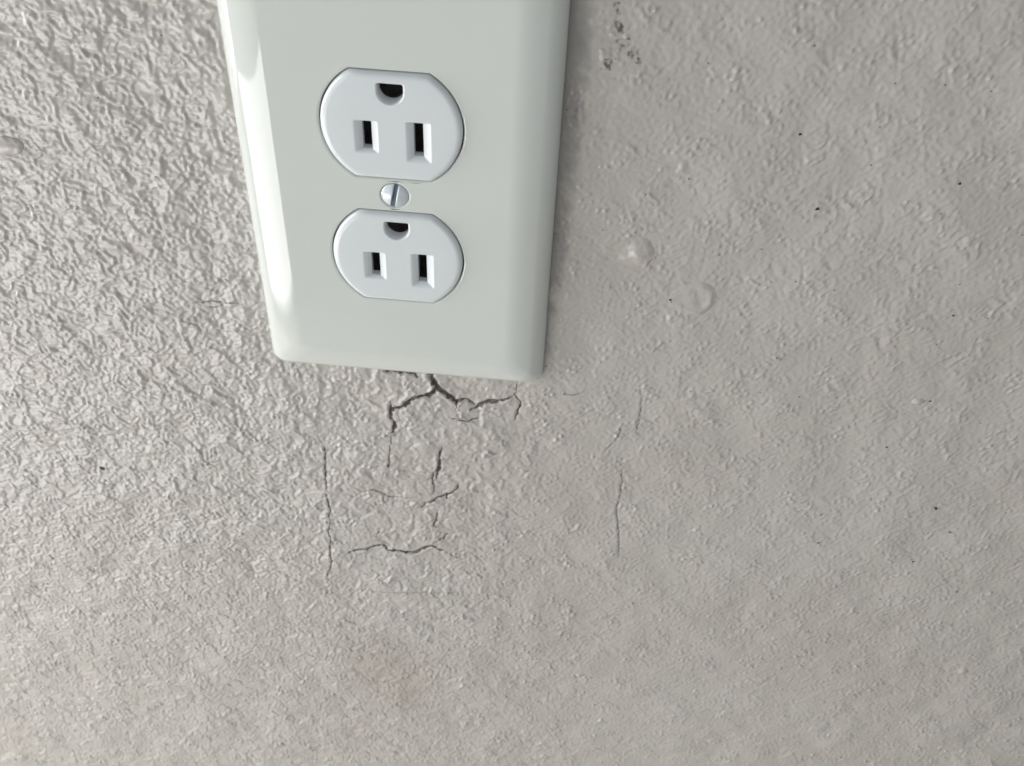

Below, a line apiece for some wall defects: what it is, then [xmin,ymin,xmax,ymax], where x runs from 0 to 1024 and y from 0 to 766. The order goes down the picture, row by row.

crack [386,370,522,468]
crack [324,446,459,575]